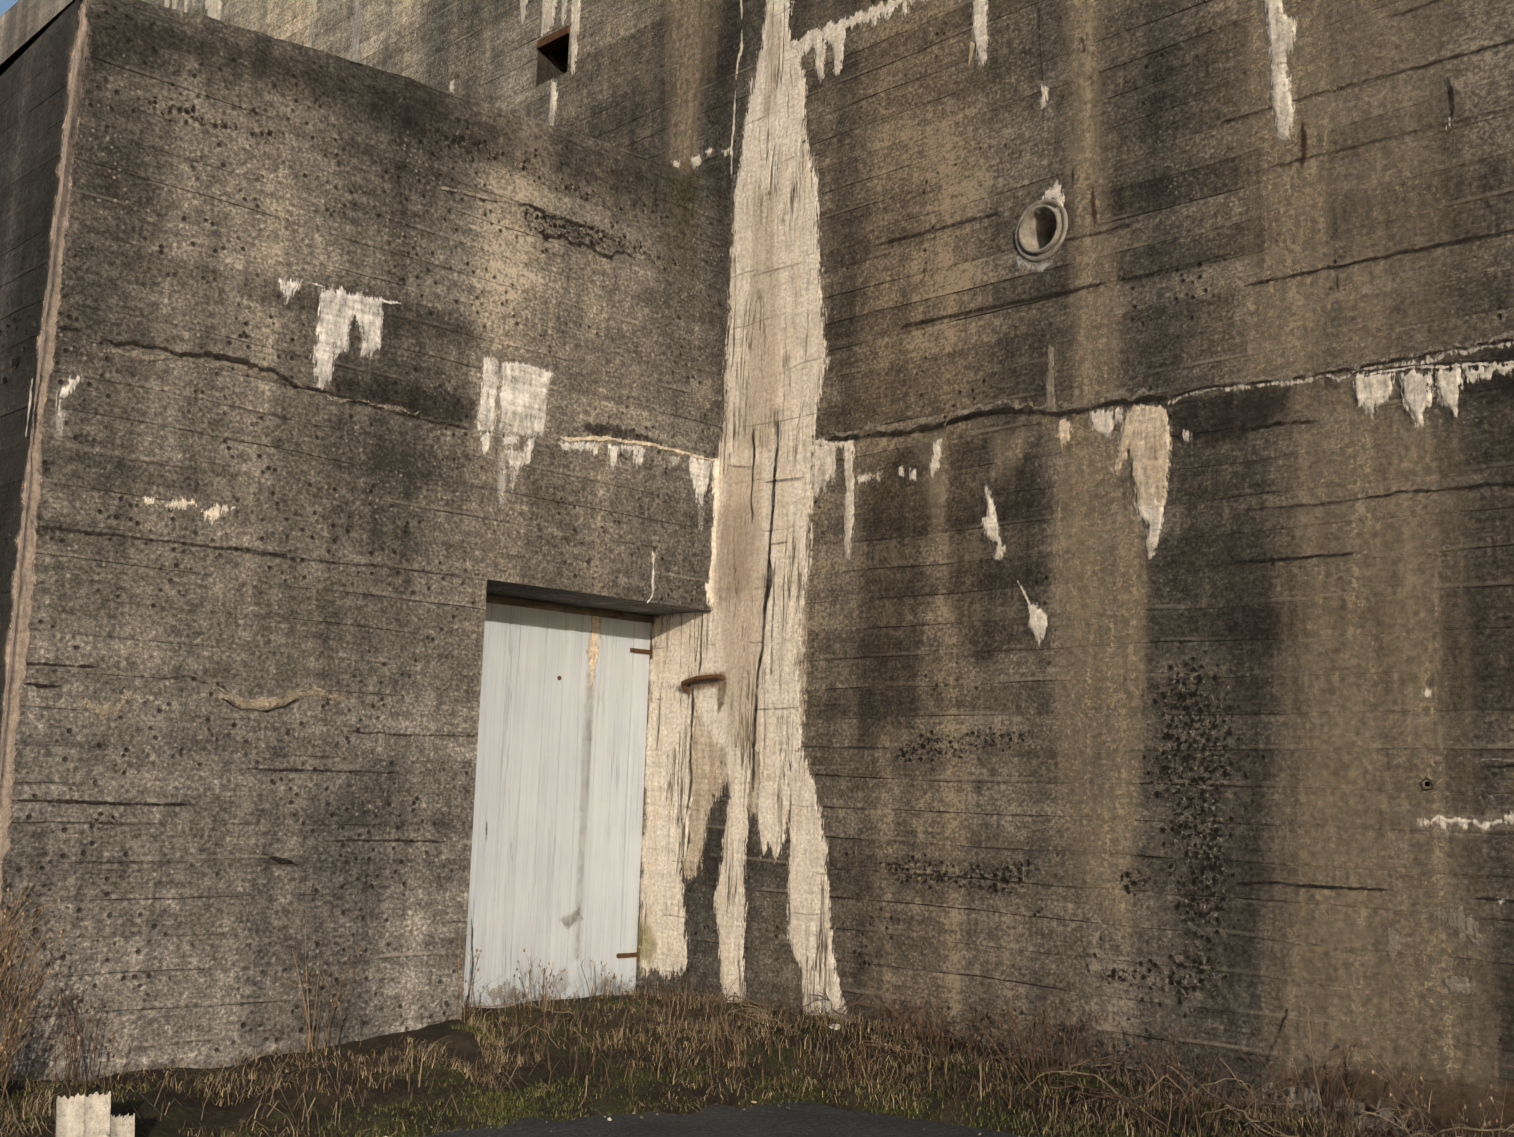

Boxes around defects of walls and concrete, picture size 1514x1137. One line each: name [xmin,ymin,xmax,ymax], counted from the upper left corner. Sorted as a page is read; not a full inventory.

water stain [155,25,520,159]
crack [1247,230,1513,289]
crack [56,325,473,430]
crack [816,330,1514,442]
water stain [1492,348,1514,394]
water stain [538,0,848,1021]
water stain [930,438,974,515]
water stain [1050,0,1143,915]
crack [731,422,803,791]
water stain [1287,407,1514,1137]
crack [1373,802,1514,838]
crack [1239,881,1389,891]